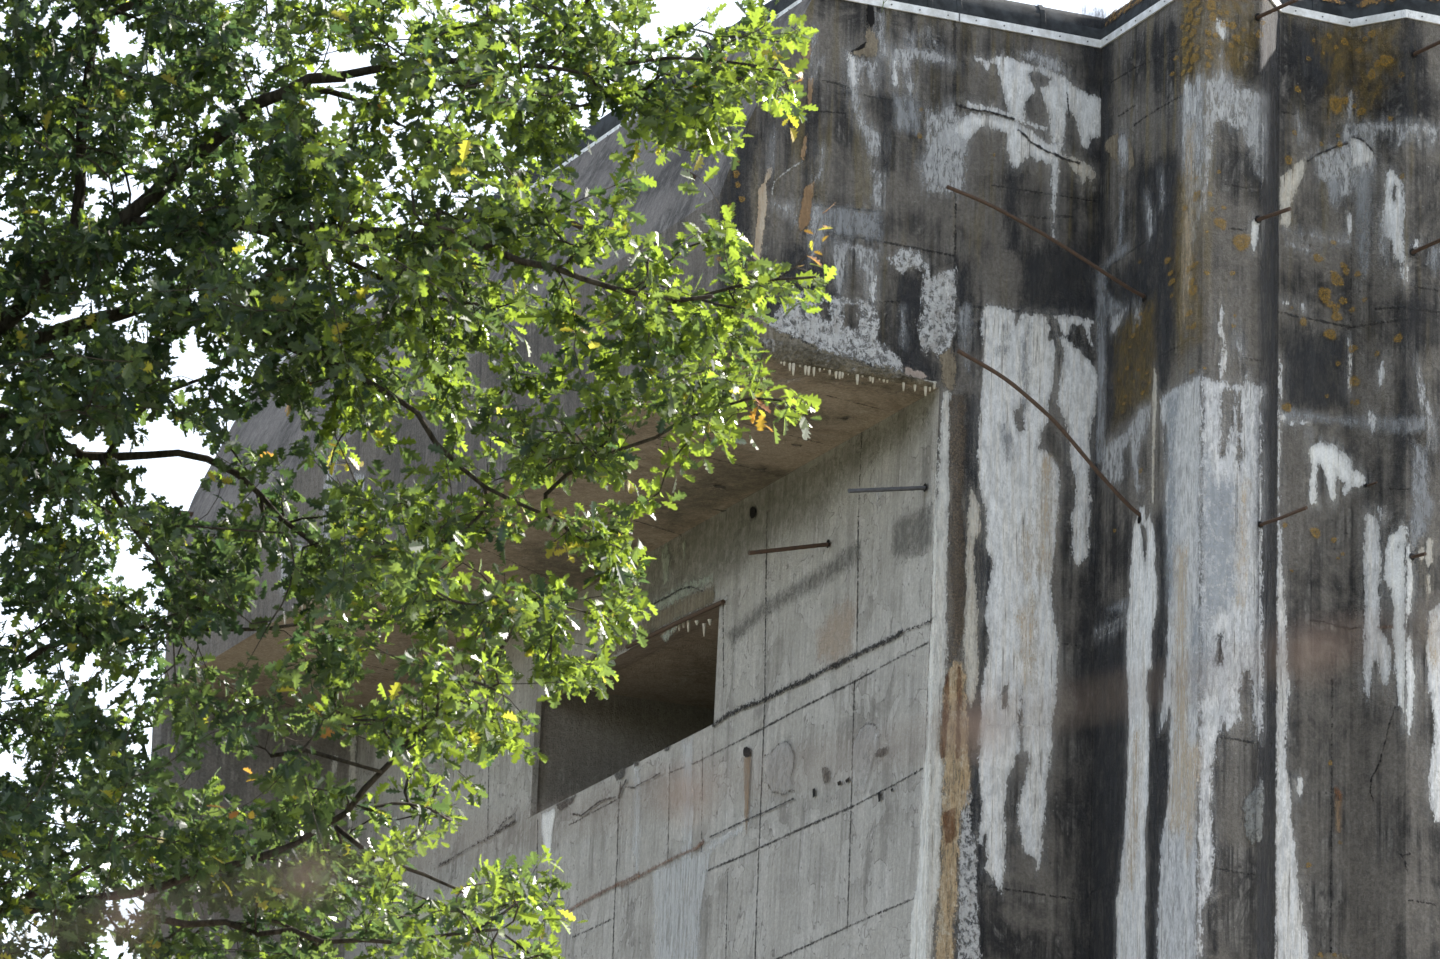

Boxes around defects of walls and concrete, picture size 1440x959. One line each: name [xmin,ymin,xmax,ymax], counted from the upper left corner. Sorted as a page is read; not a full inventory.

spalling [740,313,967,662]
leakage [719,2,1440,959]
corrosion [935,661,970,959]